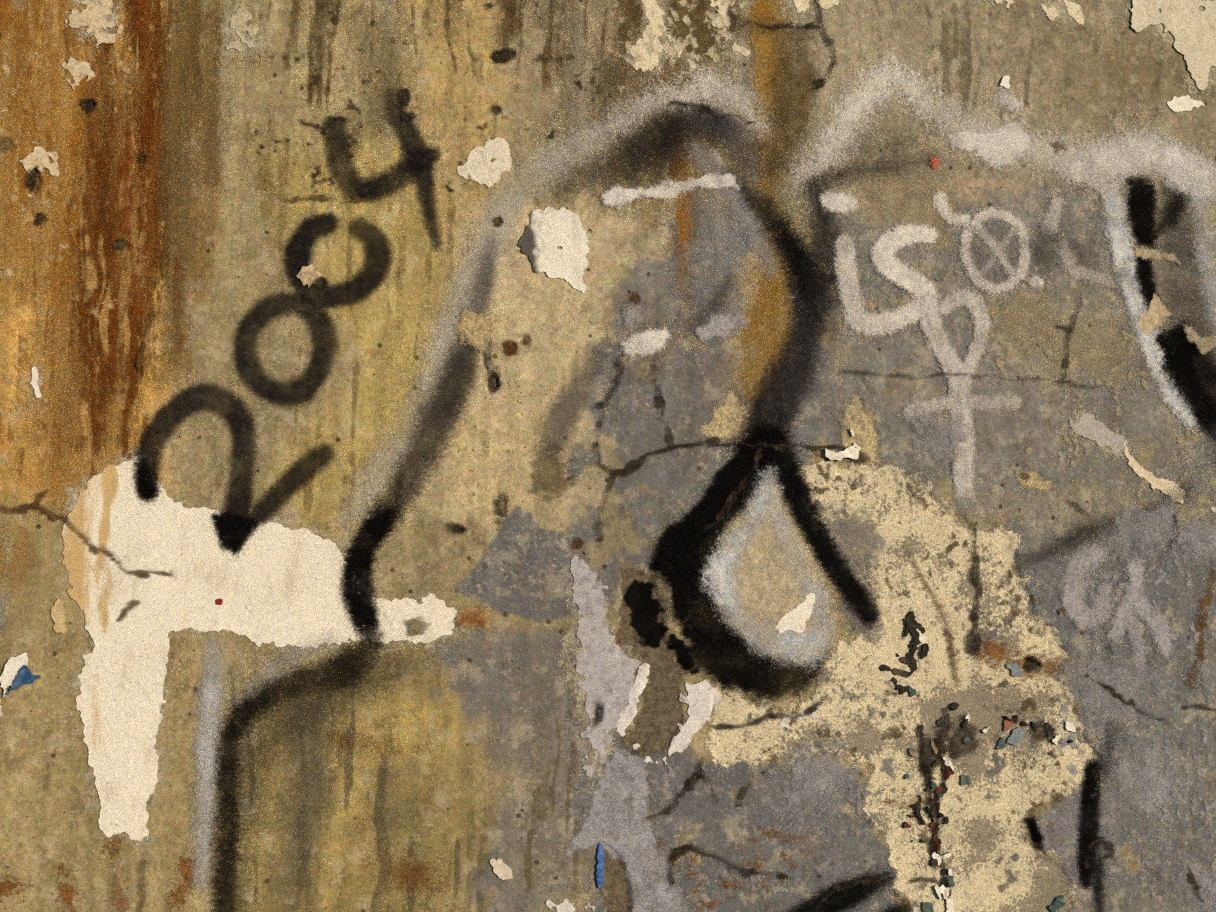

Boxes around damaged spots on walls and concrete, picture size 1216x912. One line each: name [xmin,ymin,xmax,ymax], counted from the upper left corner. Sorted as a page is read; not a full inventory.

leakage [295,0,342,107]
leakage [471,0,523,78]
leakage [602,0,644,53]
leakage [667,0,717,56]
peeling [1124,0,1216,112]
peeling [457,137,512,188]
rust [748,0,796,357]
rust [0,0,181,477]
peeling [518,207,591,293]
crack [594,355,845,545]
crack [0,491,175,621]
spalling [594,389,1096,912]